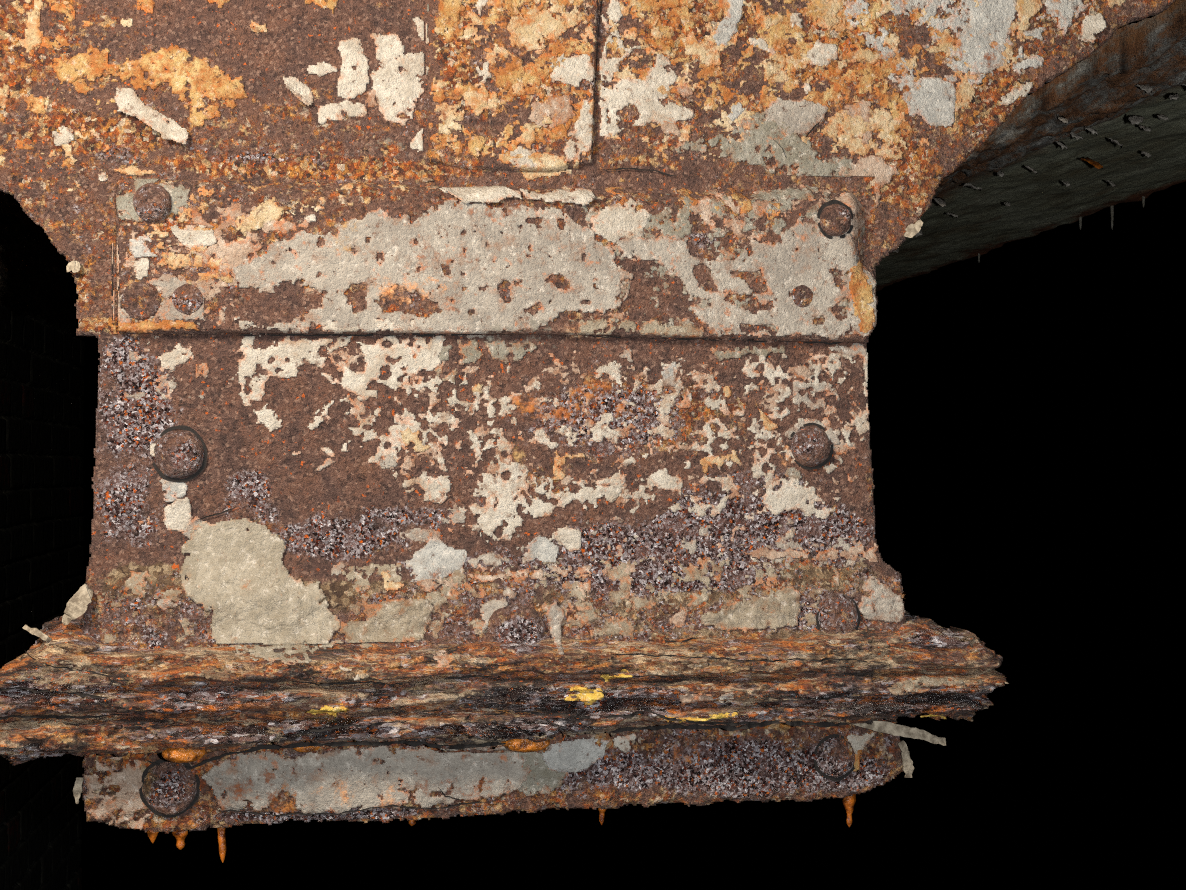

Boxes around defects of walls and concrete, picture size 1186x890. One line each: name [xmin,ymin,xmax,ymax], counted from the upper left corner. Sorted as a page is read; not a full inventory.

corrosion [904,220,923,238]
peeling [0,0,1126,672]
corrosion [513,382,610,420]
corrosion [22,625,52,642]
peeling [887,670,1009,695]
corrosion [853,721,946,778]
corrosion [73,777,84,804]
corrosion [234,770,296,812]
peeling [202,733,636,815]
corrosion [842,794,856,827]
corrosion [147,830,188,850]
corrosion [217,828,226,863]